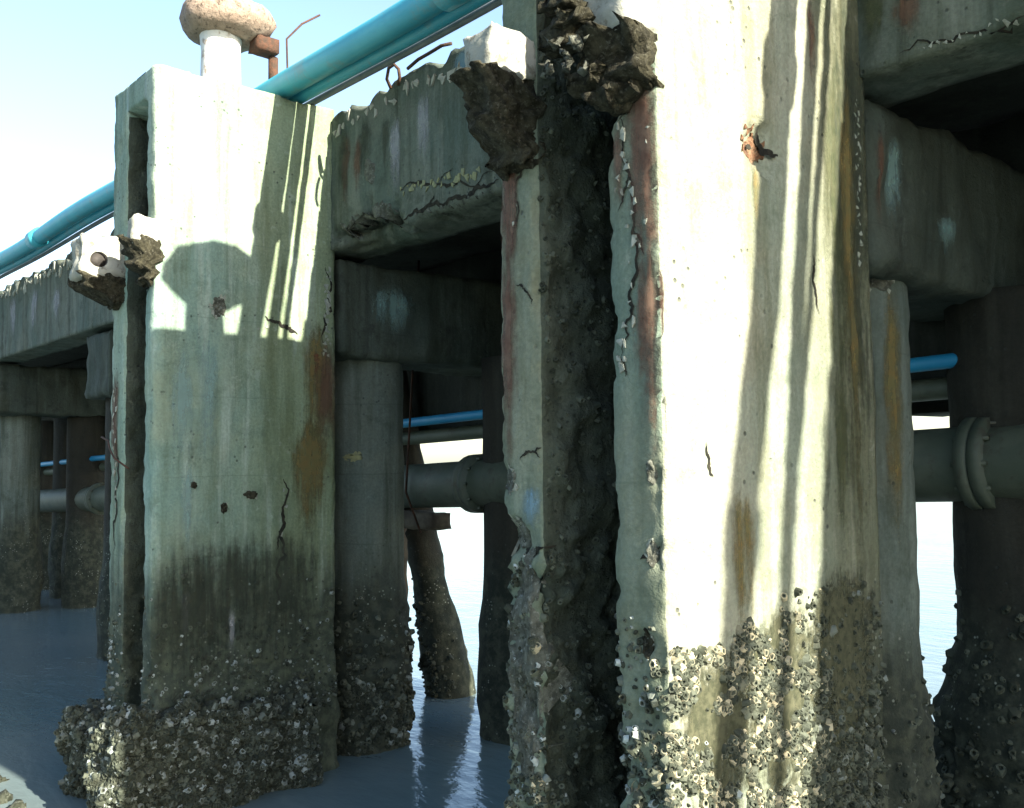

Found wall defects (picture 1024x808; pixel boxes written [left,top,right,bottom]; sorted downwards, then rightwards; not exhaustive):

peeling [332,42,462,138]
crack [900,16,1023,53]
spalling [208,294,226,319]
crack [400,166,522,256]
corrosion [502,173,516,443]
crack [614,114,649,376]
corrosion [614,90,664,419]
corrosion [293,329,334,517]
leakage [158,541,313,659]
crack [275,479,290,613]
spalling [506,514,574,779]
corrosion [734,501,754,605]